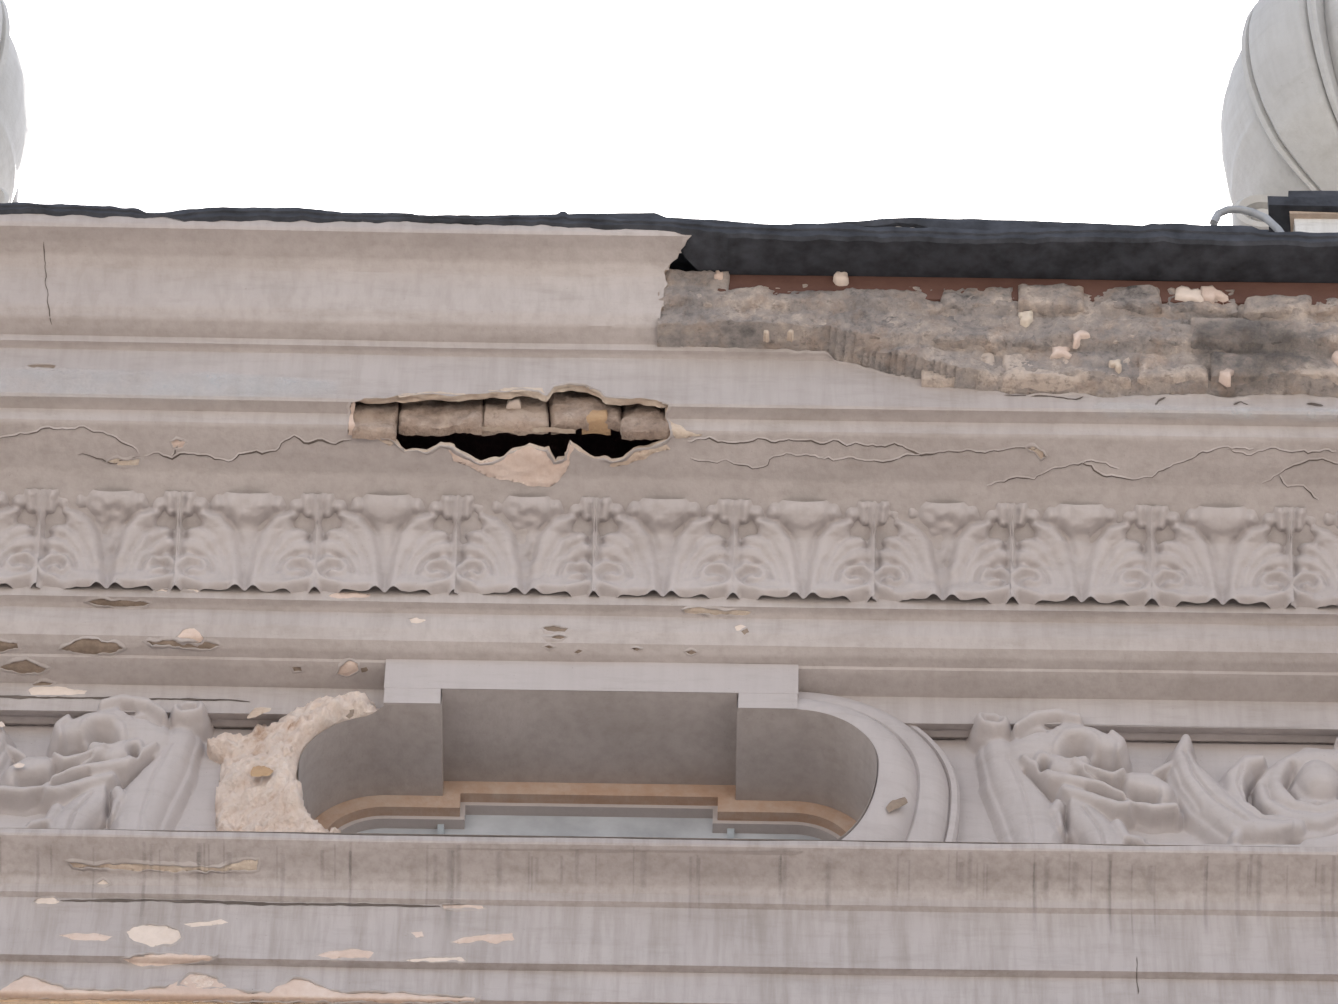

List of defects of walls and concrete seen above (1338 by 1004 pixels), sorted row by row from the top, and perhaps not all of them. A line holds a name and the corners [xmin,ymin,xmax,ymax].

flaking render [656,235,1338,406]
crack [0,425,351,465]
flaking render [346,382,702,487]
crack [687,436,1338,500]
peeling [0,638,91,699]
peeling [57,636,128,657]
peeling [142,625,223,652]
flaking render [207,658,379,833]
peeling [32,896,64,907]
peeling [65,857,261,888]
peeling [0,917,481,1004]
peeling [400,931,519,966]